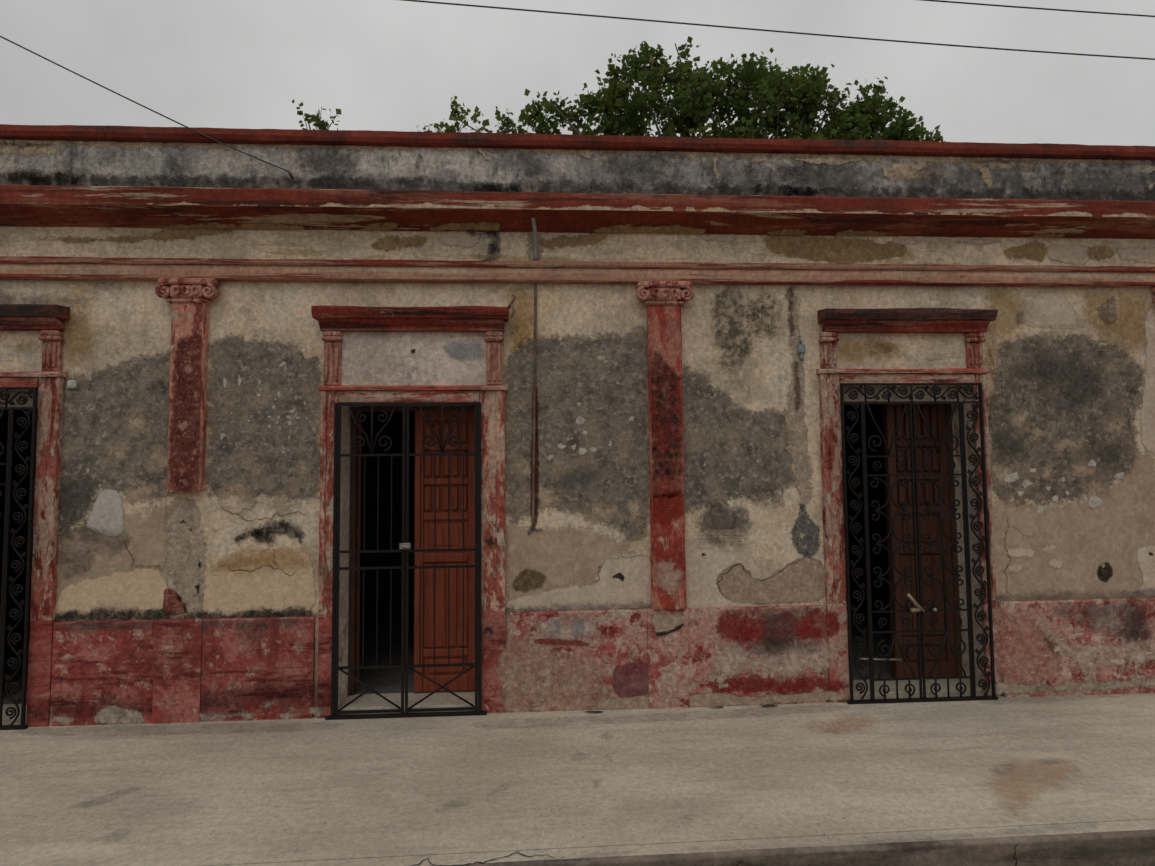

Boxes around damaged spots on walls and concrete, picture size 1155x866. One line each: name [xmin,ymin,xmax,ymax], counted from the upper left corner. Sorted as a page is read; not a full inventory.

leakage [0,140,1155,201]
flaking render [53,222,305,244]
flaking render [361,202,501,252]
peeling [541,224,736,250]
flaking render [764,228,906,264]
flaking render [957,233,1065,262]
flaking render [1087,246,1114,261]
flaking render [716,504,825,604]
flaking render [652,613,686,636]
peeling [494,614,649,712]
peeling [689,636,849,707]
peeling [985,606,1155,695]